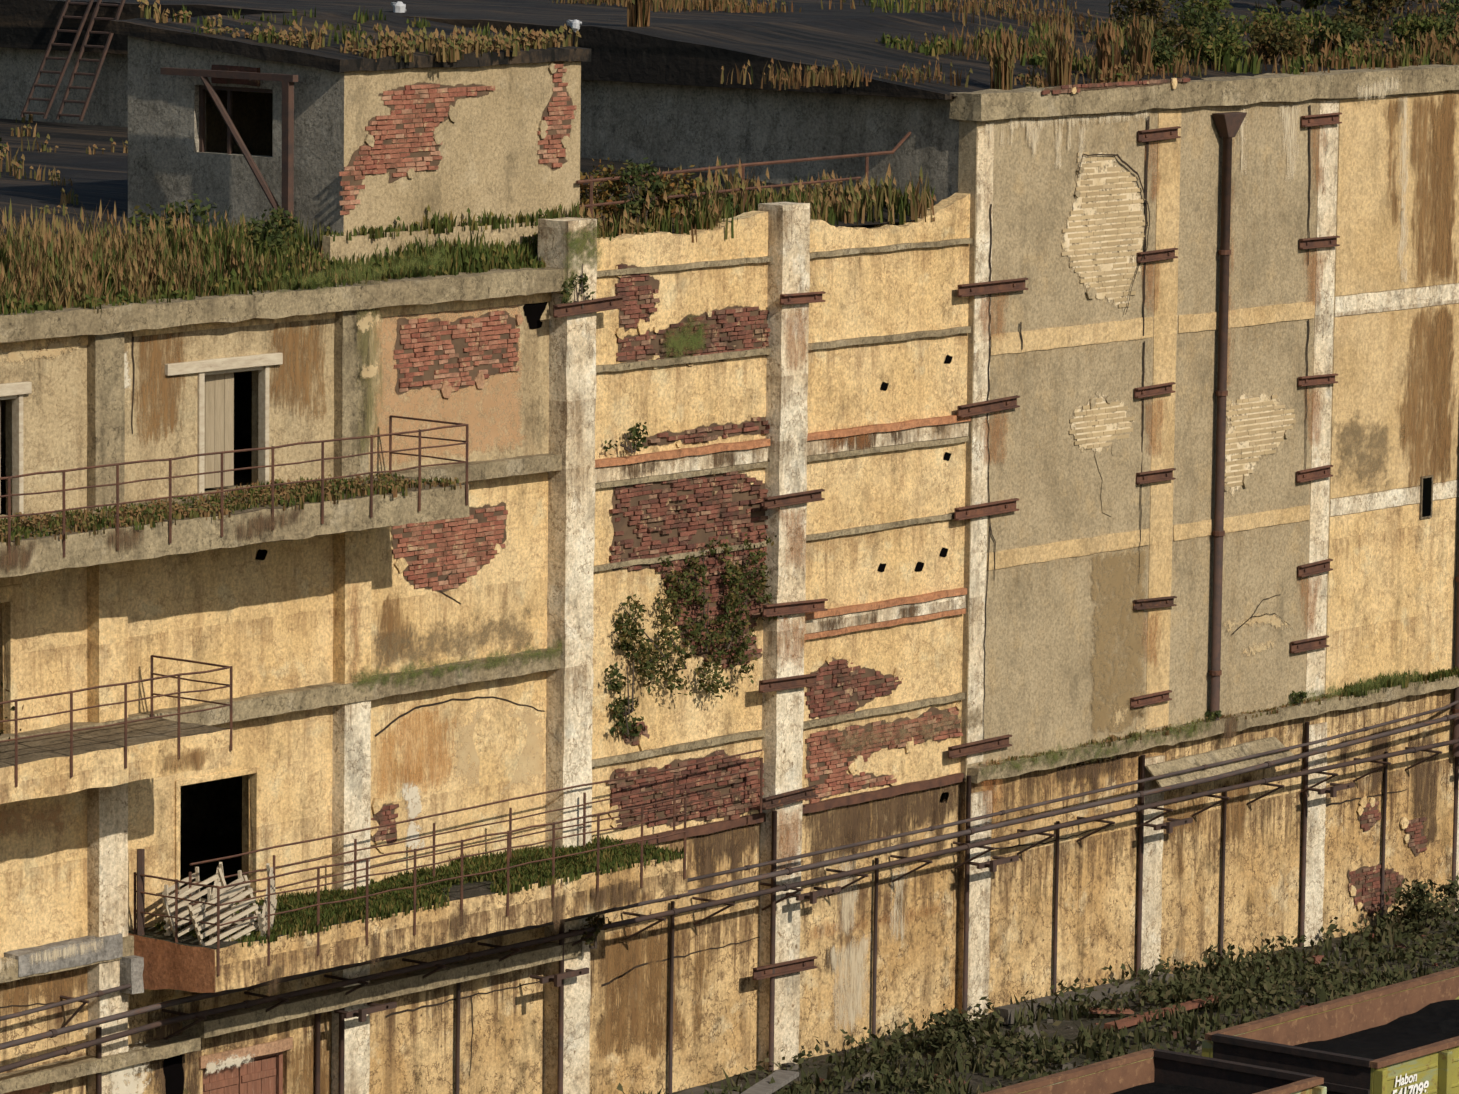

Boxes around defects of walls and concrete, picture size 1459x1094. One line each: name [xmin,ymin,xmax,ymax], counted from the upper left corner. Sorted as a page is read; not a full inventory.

flaking render [339,82,495,215]
flaking render [537,61,577,170]
peeling [1061,152,1149,309]
water stain [1361,80,1458,286]
flaking render [357,302,547,463]
flaking render [615,263,770,369]
water stain [1339,308,1456,488]
flaking render [391,502,508,593]
flaking render [609,470,768,668]
crack [375,696,545,737]
flaking render [606,721,764,830]
flaking render [805,656,963,804]